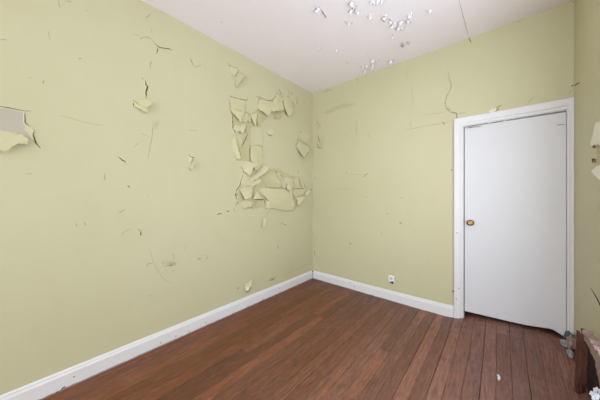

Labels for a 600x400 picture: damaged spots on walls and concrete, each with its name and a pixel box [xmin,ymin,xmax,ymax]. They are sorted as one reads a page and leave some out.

crack [132,12,173,68]
crack [458,0,472,43]
peeling [0,105,41,152]
peeling [132,77,152,114]
peeling [217,88,312,227]
crack [403,72,506,131]
peeling [590,121,600,180]